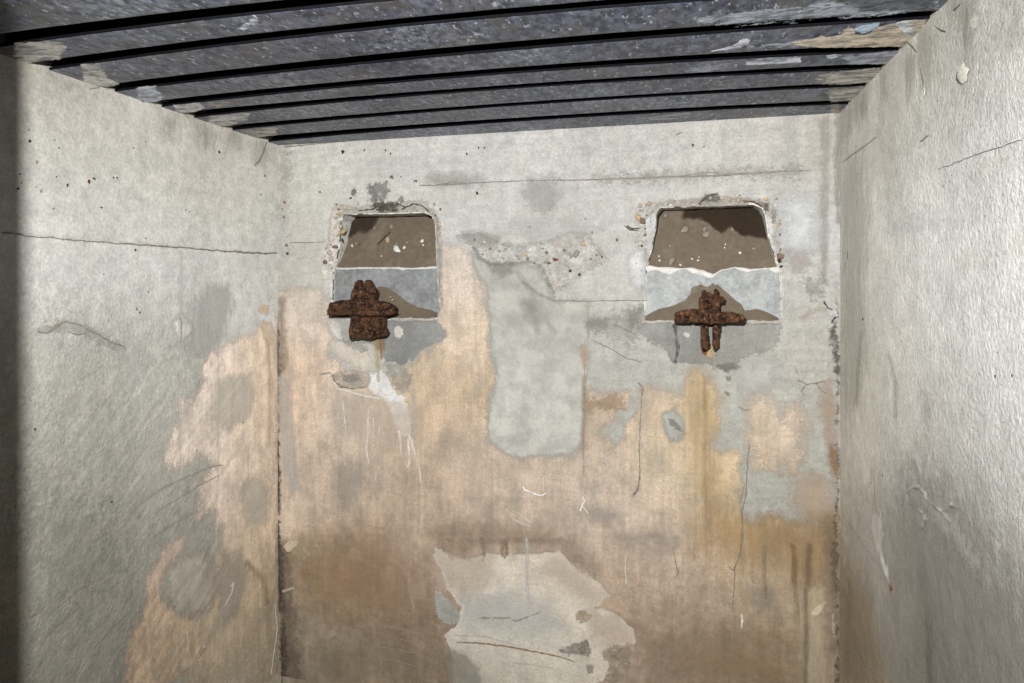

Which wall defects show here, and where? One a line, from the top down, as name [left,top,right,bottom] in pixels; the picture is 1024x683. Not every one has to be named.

crack [2,232,315,255]
spalling [321,176,443,296]
spalling [456,221,606,297]
spalling [627,193,785,288]
damp [779,194,826,270]
damp [278,300,318,679]
peeling [330,319,380,400]
damp [368,351,422,529]
crack [553,300,646,496]
crack [728,444,750,612]
damp [829,312,840,385]
peeling [433,538,636,683]